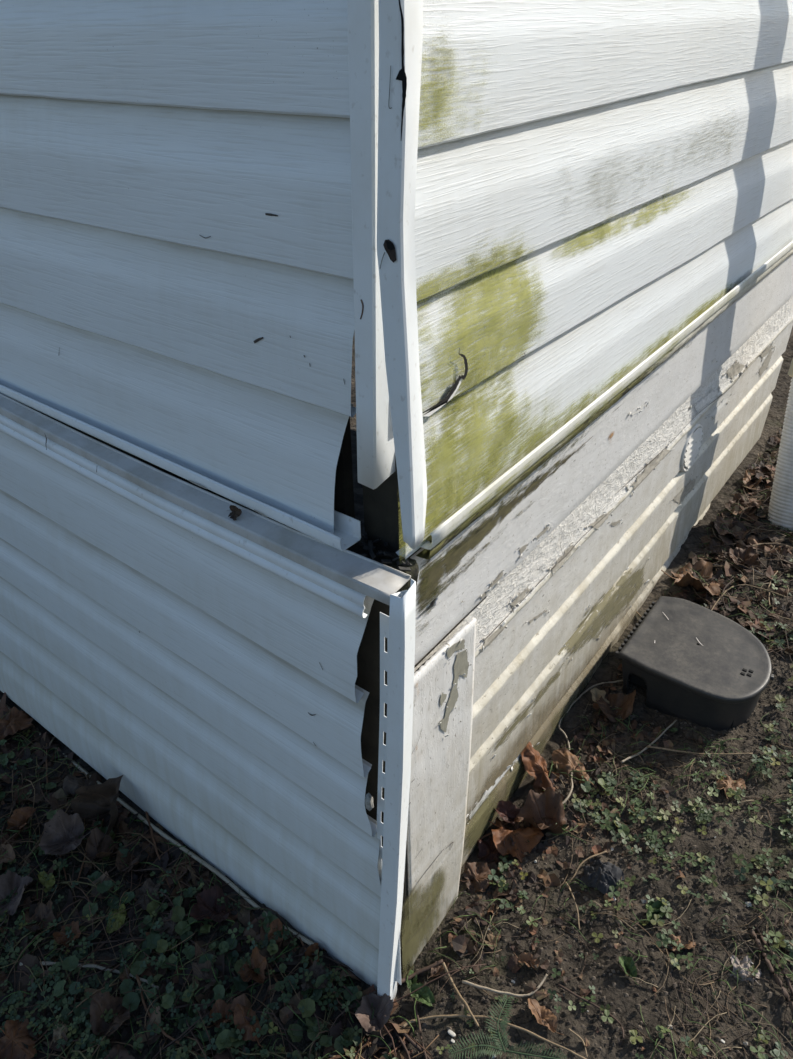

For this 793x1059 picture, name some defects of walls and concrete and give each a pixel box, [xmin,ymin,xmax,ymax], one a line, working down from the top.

crack [388,0,407,139]
peeling [724,341,775,382]
peeling [627,442,675,496]
peeling [671,476,699,506]
peeling [586,511,624,530]
peeling [518,523,551,557]
peeling [549,542,580,576]
peeling [480,570,507,599]
peeling [481,621,509,653]
peeling [438,639,471,737]